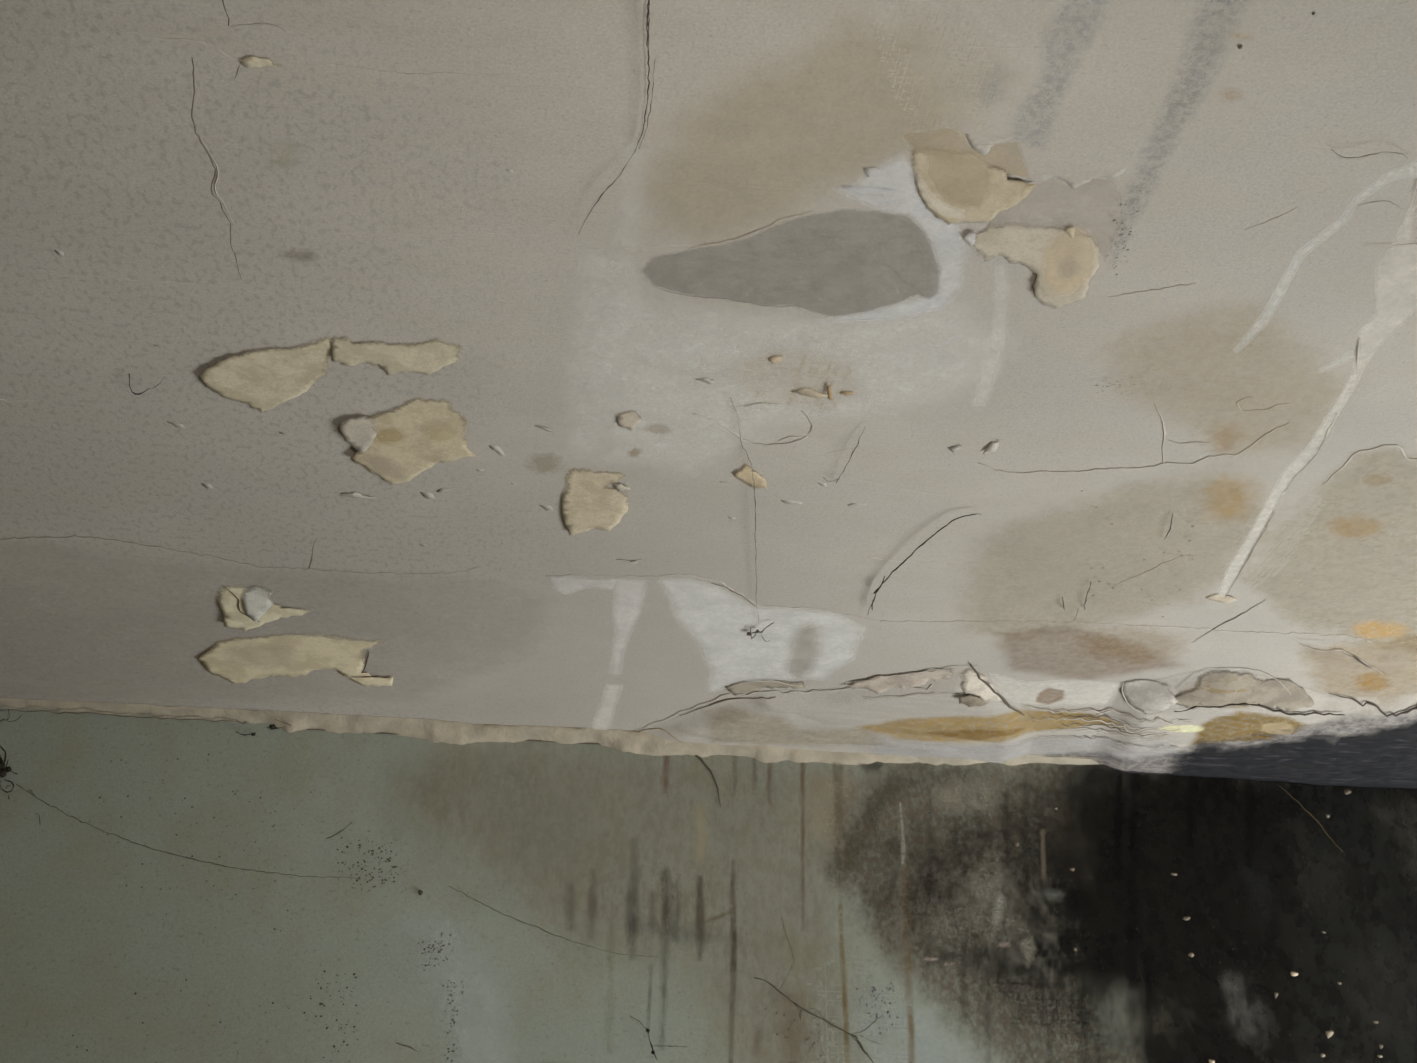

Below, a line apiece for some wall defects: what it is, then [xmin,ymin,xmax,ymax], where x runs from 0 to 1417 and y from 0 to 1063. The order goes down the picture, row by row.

crack [222,0,286,32]
crack [191,57,242,280]
damp [1107,0,1237,275]
flaking render [642,129,1125,320]
peeling [199,338,461,413]
peeling [339,399,475,485]
peeling [561,470,631,535]
damp [1253,452,1417,697]
peeling [197,585,393,687]
damp [789,625,819,678]
damp [418,688,1417,1063]